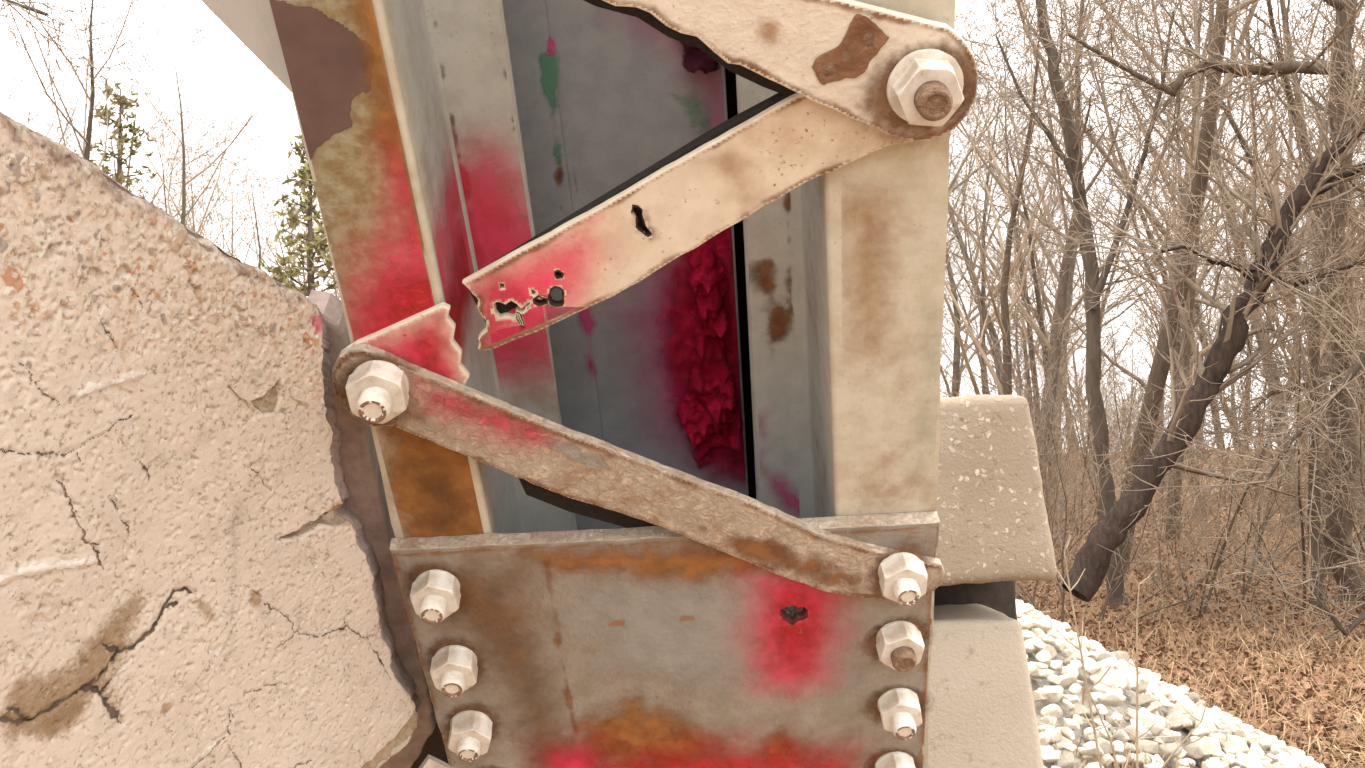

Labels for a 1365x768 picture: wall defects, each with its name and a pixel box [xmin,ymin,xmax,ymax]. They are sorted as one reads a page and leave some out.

rust [355,0,425,250]
rust [722,53,813,110]
rust [813,0,979,140]
rust [751,260,792,342]
rust [503,410,612,456]
crack [0,415,132,570]
rust [536,493,939,599]
water stain [3,595,139,738]
crack [0,587,194,726]
crack [246,586,388,674]
crack [192,683,287,768]